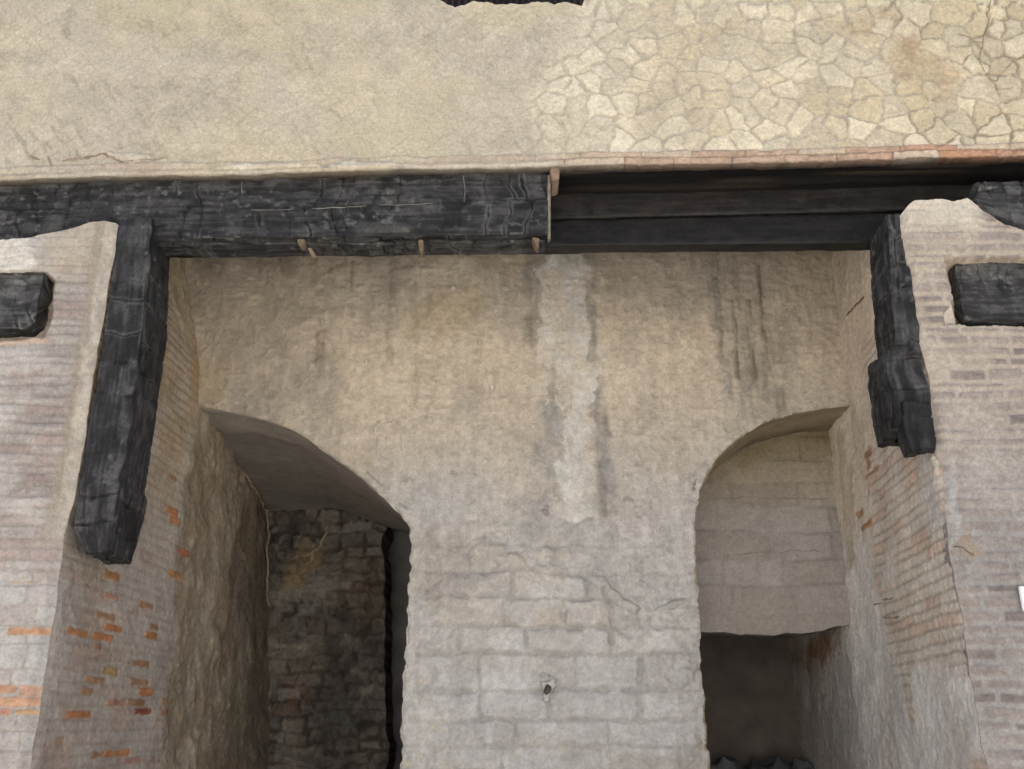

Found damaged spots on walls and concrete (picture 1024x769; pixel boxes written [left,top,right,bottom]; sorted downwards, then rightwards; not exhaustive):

crack [958,1,1024,90]
damp [506,253,634,590]
damp [701,251,792,425]